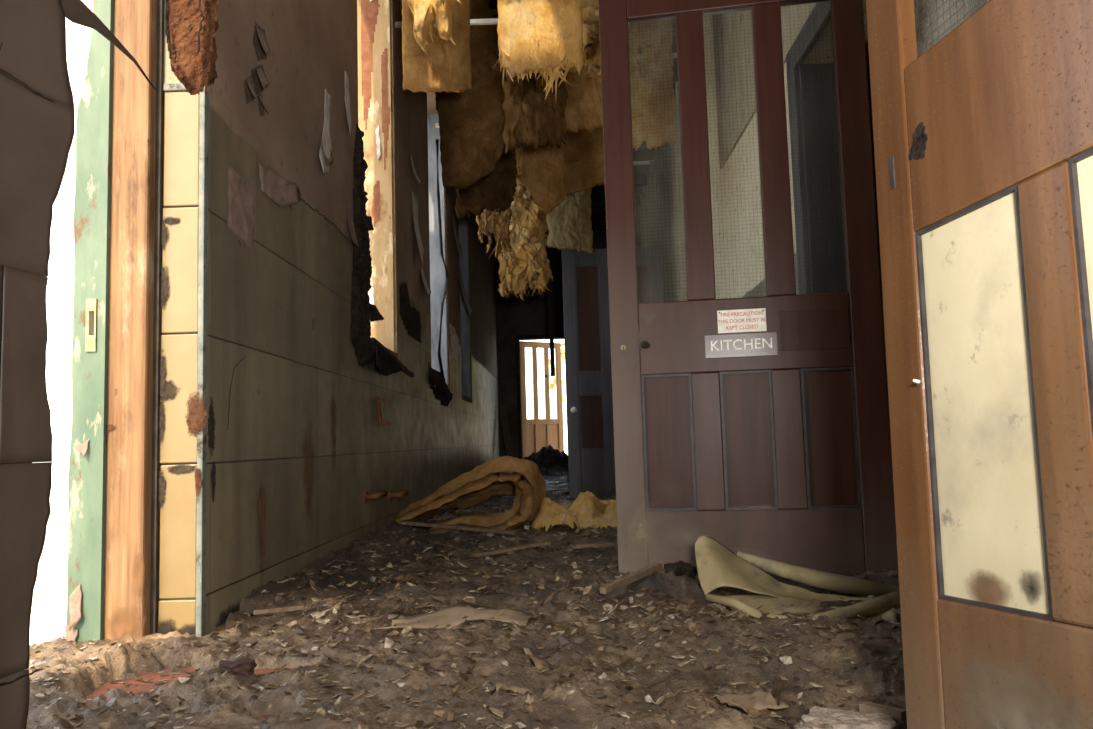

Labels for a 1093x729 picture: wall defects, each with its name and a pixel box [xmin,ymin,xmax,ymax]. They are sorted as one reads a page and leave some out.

peeling [62,0,156,90]
spalling [165,0,219,95]
peeling [244,21,271,117]
spalling [344,0,414,377]
spalling [399,281,421,343]
spalling [428,361,453,406]
peeling [74,439,89,457]
peeling [64,585,82,642]
leakage [972,575,1004,605]
leakage [1023,575,1039,598]